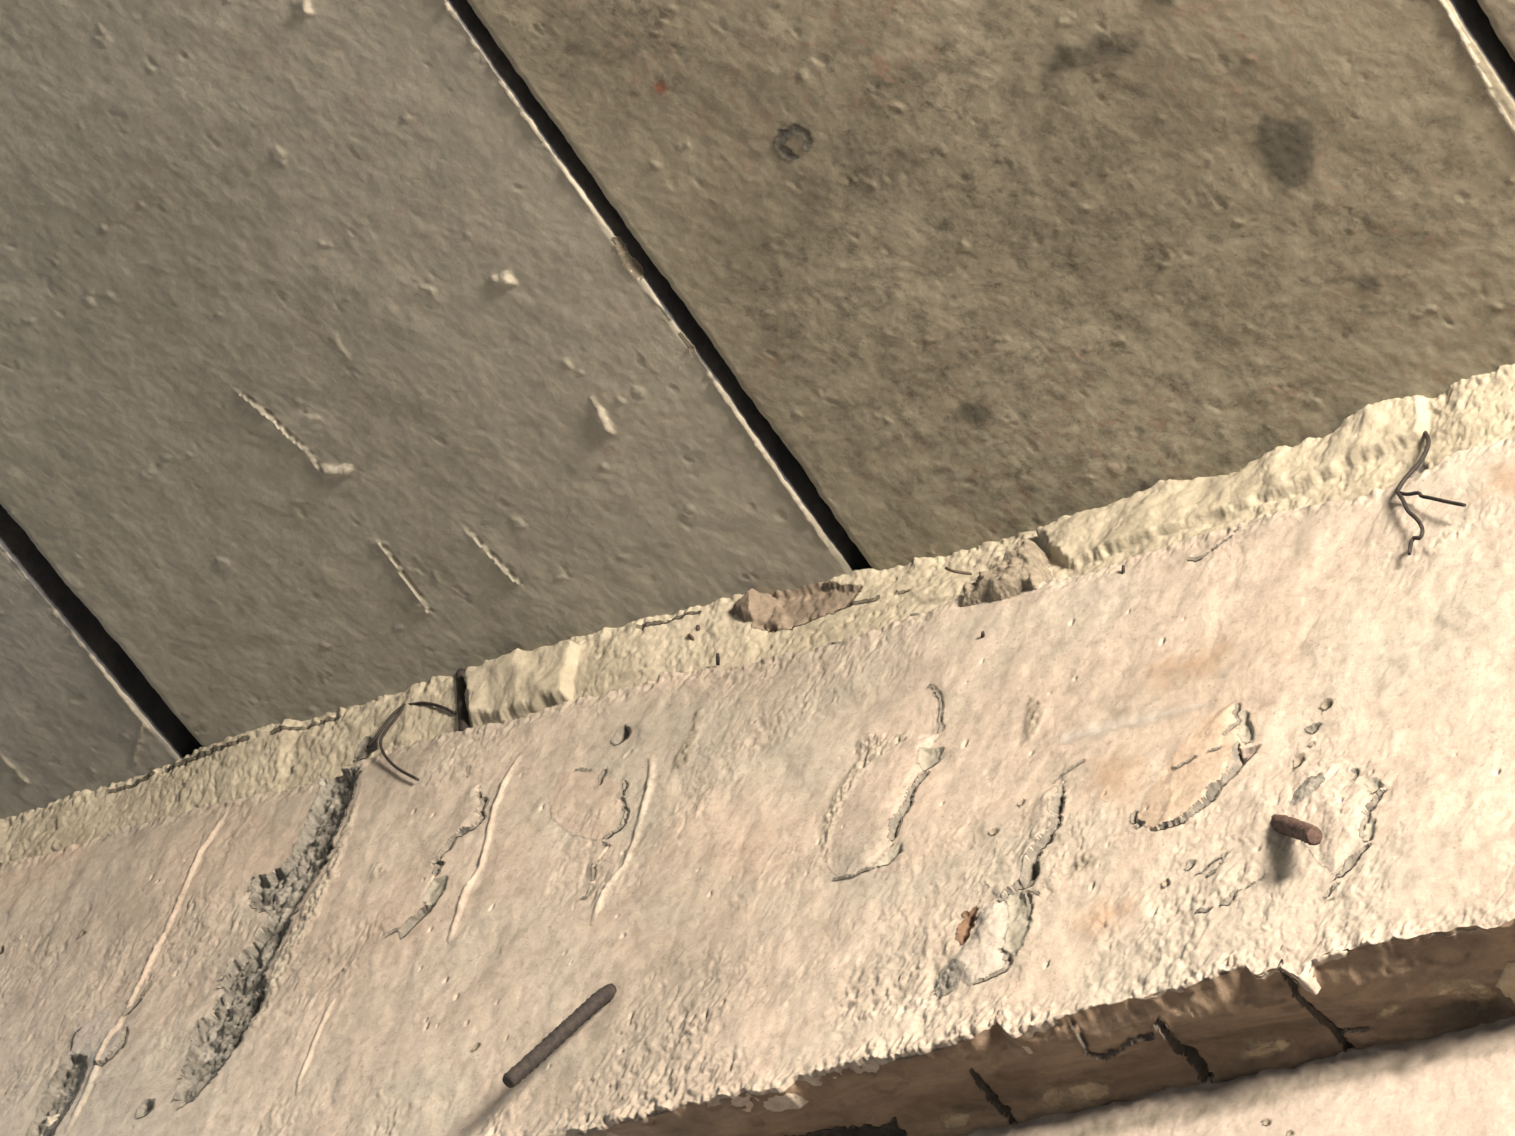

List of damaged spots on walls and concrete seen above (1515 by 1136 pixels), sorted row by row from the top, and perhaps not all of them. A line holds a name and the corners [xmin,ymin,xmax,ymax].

crack [385,764,489,939]
crack [574,767,629,900]
crack [833,684,945,880]
crack [998,759,1086,921]
crack [1129,702,1262,830]
crack [1324,777,1387,900]
spalling [171,766,361,1110]
spalling [26,1053,88,1136]